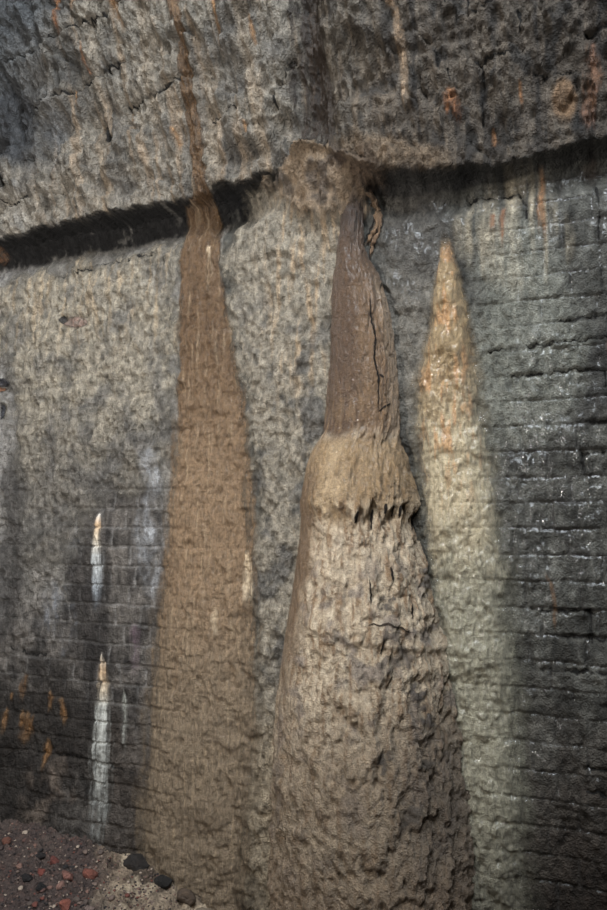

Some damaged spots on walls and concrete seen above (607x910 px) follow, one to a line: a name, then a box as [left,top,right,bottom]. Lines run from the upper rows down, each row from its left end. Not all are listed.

damp [218,188,341,910]
damp [90,654,109,841]
damp [376,630,414,674]
damp [410,683,434,727]